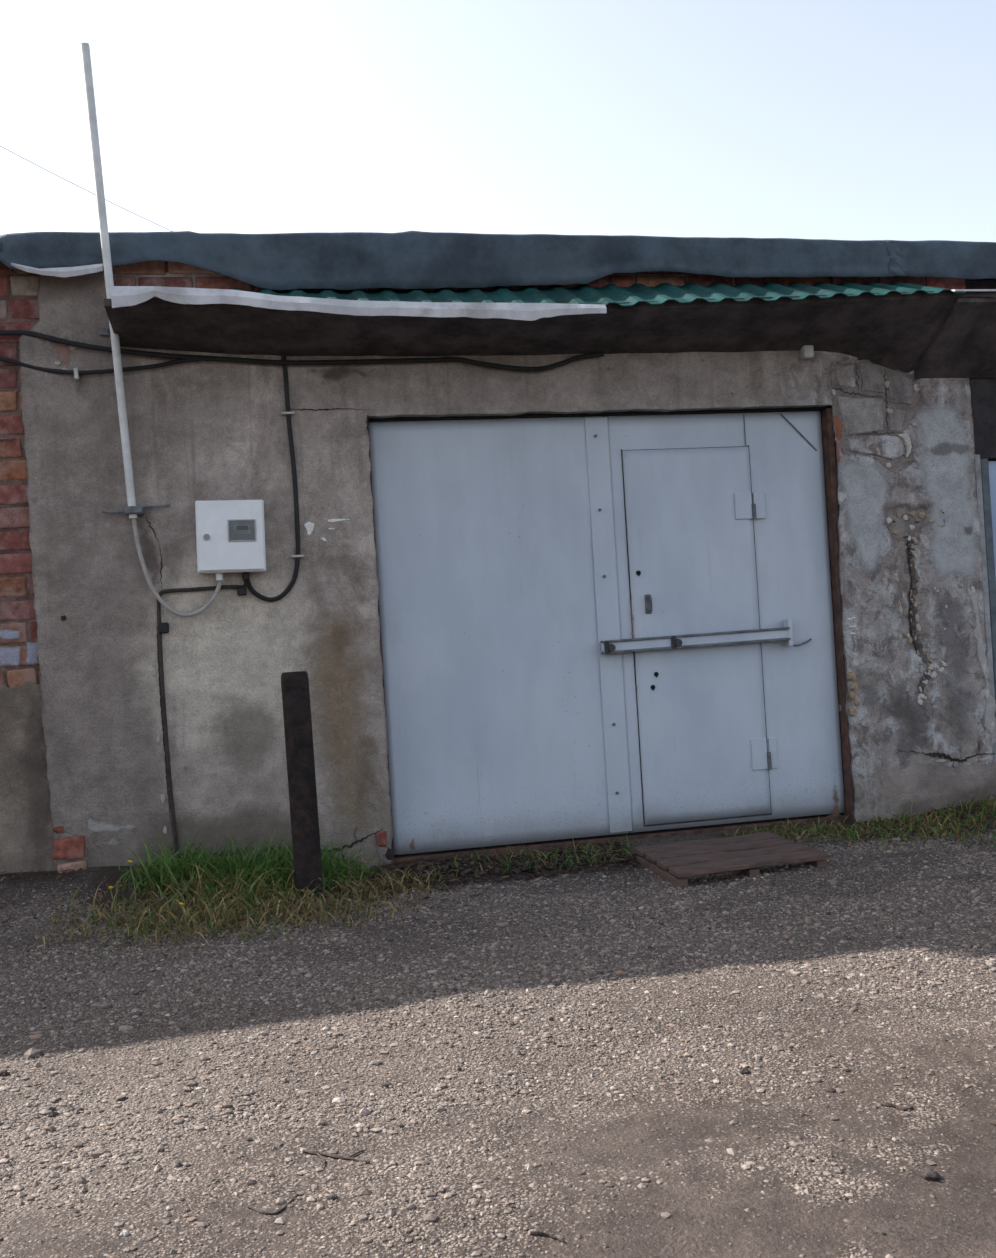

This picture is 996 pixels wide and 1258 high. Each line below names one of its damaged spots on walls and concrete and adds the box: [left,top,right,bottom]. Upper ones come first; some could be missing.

spalling [830,361,919,473]
peeling [0,630,38,665]
crack [899,741,996,768]
spalling [52,826,89,873]